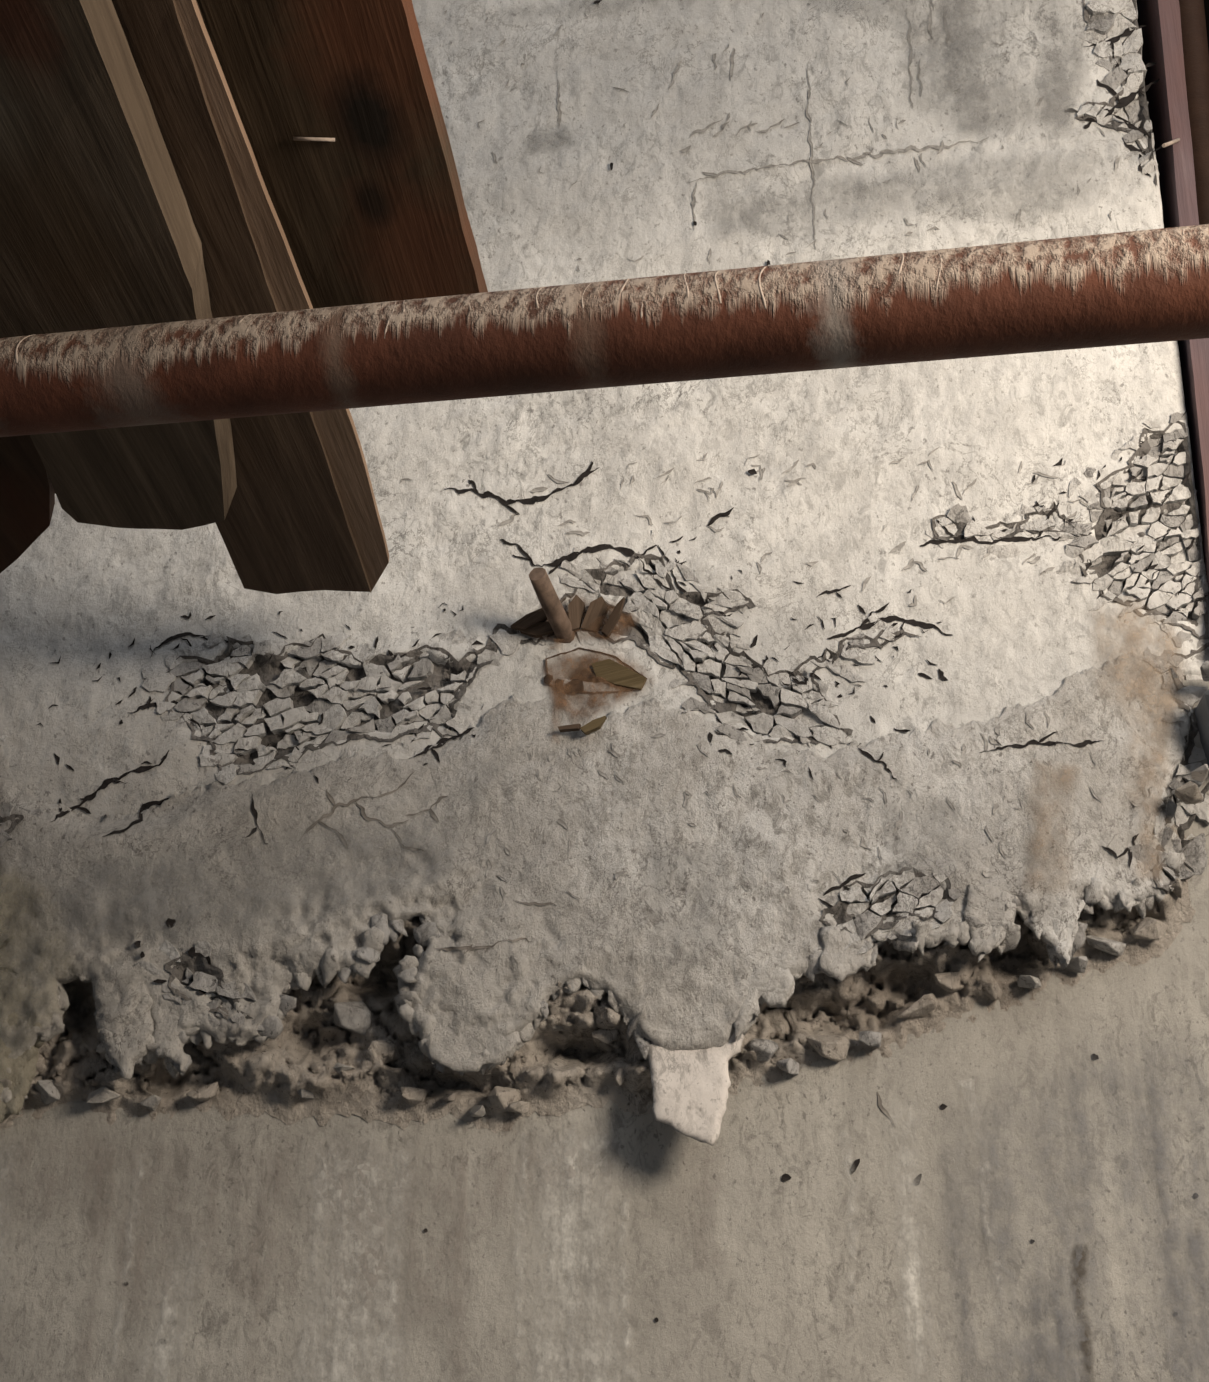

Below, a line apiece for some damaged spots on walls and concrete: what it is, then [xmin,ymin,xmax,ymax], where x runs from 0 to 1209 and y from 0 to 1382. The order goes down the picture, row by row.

crack [1036,15,1162,195]
spalling [0,791,43,847]
crack [37,705,174,837]
crack [93,602,484,851]
corrosion [545,619,634,715]
crack [444,411,1208,908]
spalling [728,412,1209,1095]
crack [435,827,580,953]
spalling [0,916,653,1133]
damp [903,1219,923,1355]
damp [1059,1248,1090,1382]